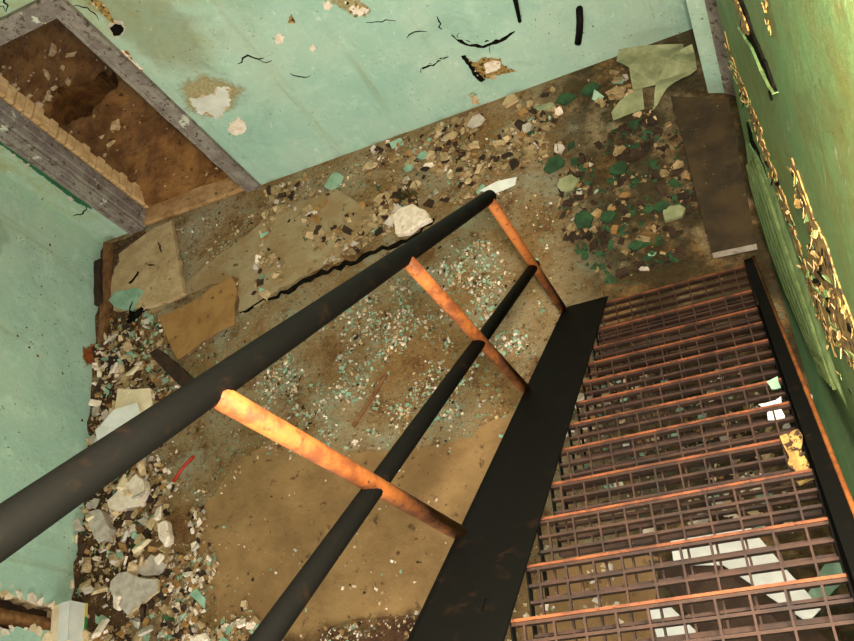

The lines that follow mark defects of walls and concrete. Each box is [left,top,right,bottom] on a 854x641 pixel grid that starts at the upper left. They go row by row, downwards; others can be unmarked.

peeling [349,4,369,18]
crack [238,55,272,64]
crack [366,17,515,73]
spalling [461,55,517,82]
peeling [189,86,247,136]
peeling [0,142,94,209]
peeling [724,33,854,370]
spalling [0,583,55,641]